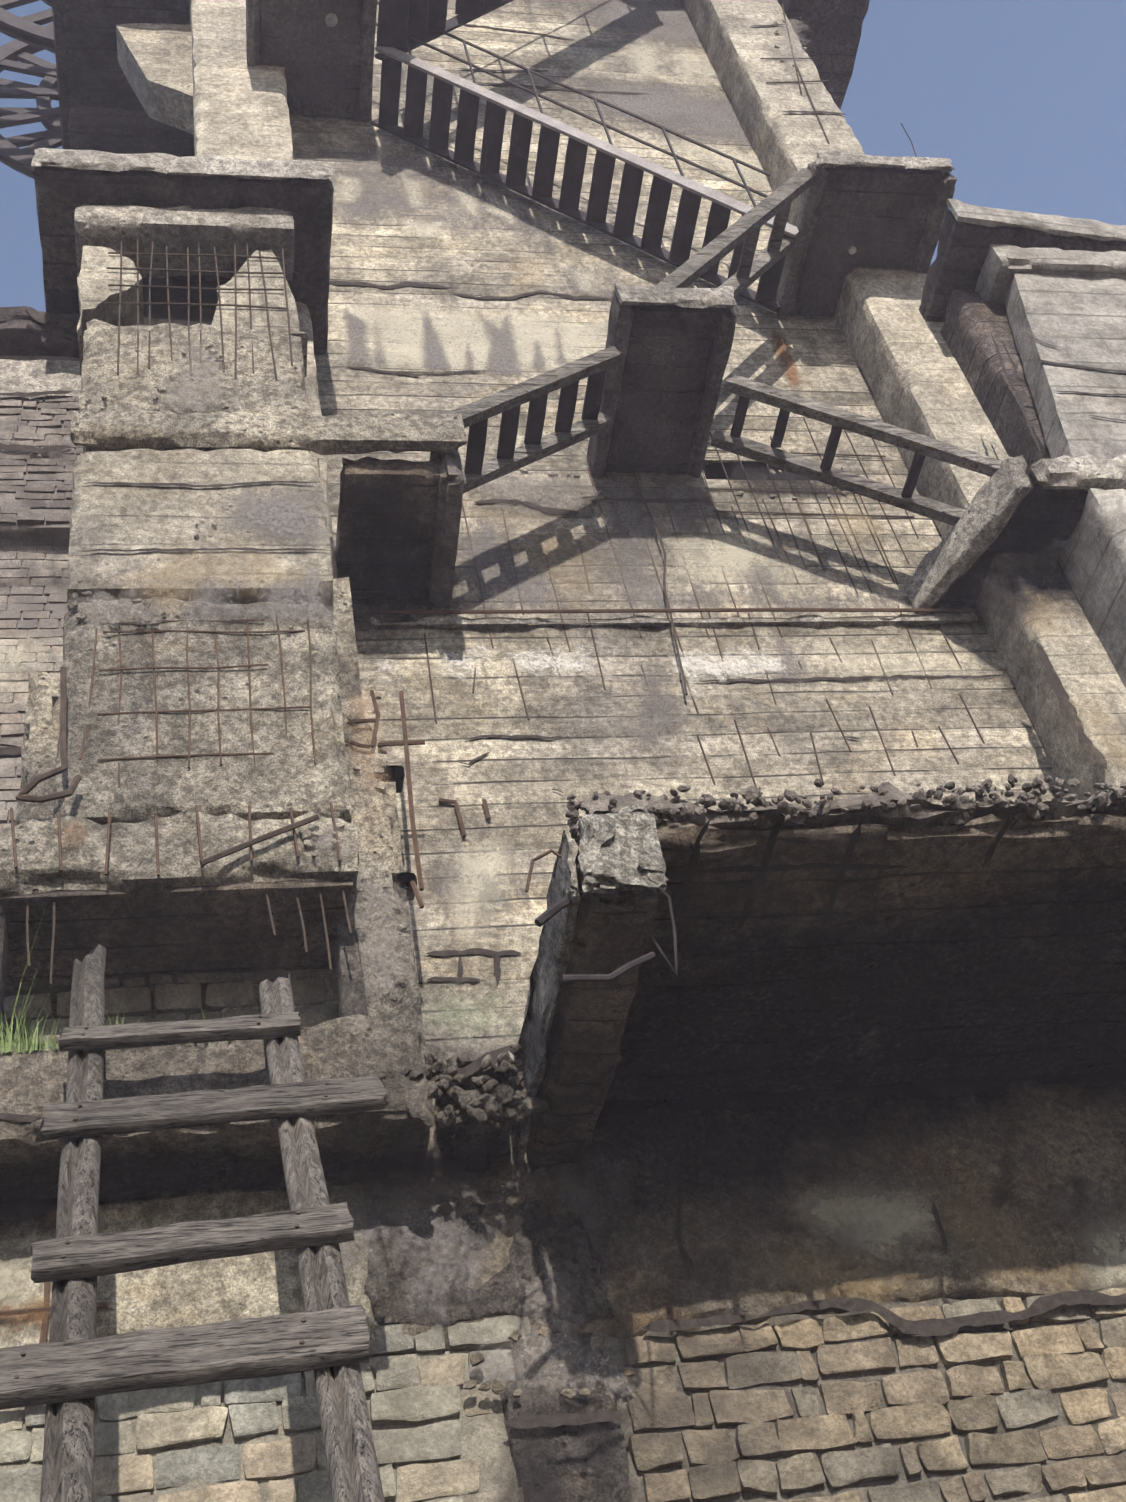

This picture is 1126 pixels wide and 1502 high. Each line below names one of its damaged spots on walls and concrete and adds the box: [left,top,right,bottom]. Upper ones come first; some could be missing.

spalling [106,238,293,413]
rust [774,334,800,384]
spalling [373,432,974,724]
spalling [10,591,316,872]
spalling [586,694,1126,830]
crack [692,640,1107,769]
spalling [362,1044,549,1140]
rust [0,1206,57,1349]
rust [98,1189,290,1234]
rust [96,1248,305,1338]
rust [327,1183,377,1351]
water stain [1092,1229,1126,1282]